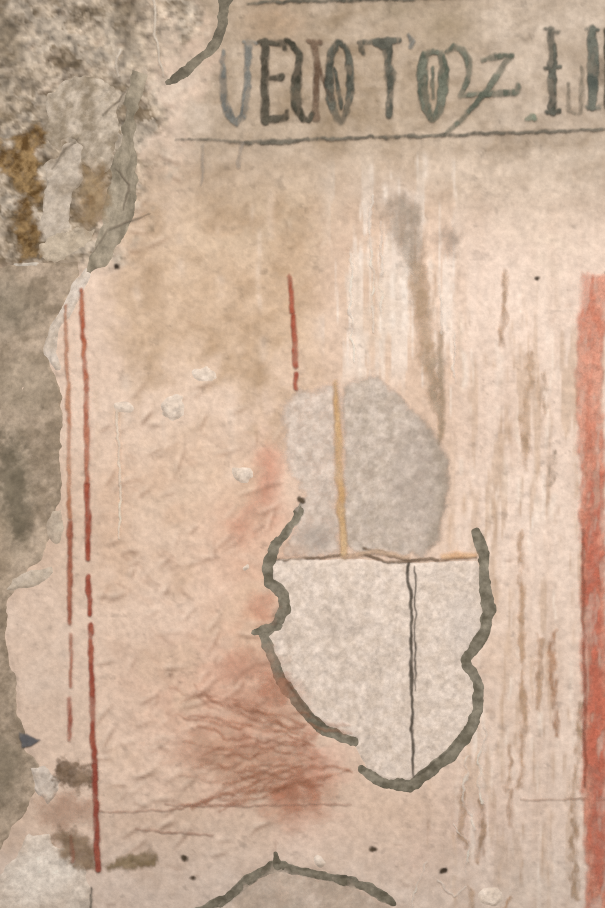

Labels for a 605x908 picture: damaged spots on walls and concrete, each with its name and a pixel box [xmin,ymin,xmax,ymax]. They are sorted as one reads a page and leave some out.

spalling [0,76,119,849]
leakage [393,204,444,436]